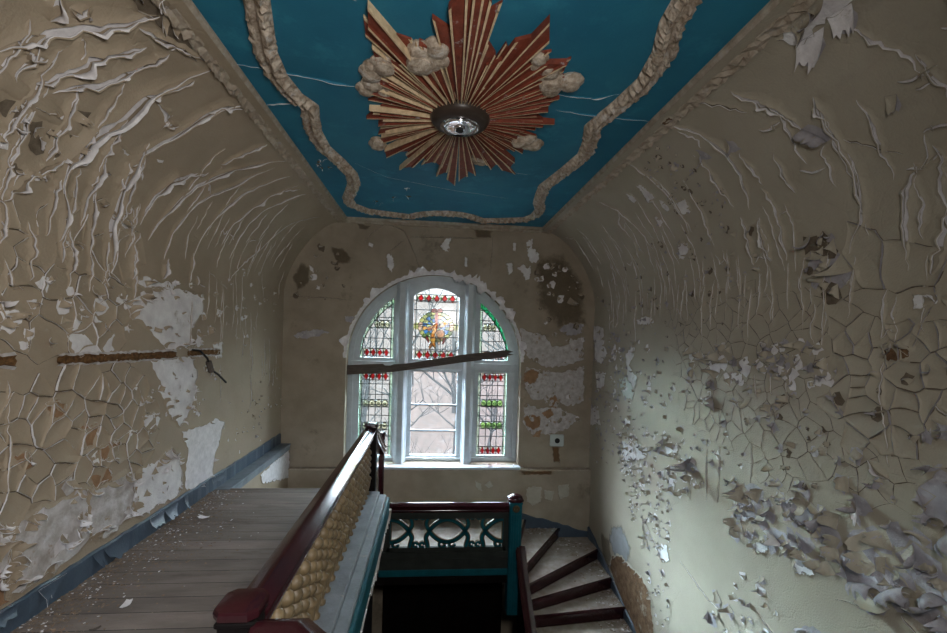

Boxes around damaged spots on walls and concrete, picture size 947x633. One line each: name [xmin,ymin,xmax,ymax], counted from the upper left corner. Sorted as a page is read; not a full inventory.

peeling [0,99,94,164]
crack [0,0,317,528]
peeling [504,238,585,307]
crack [557,25,947,515]